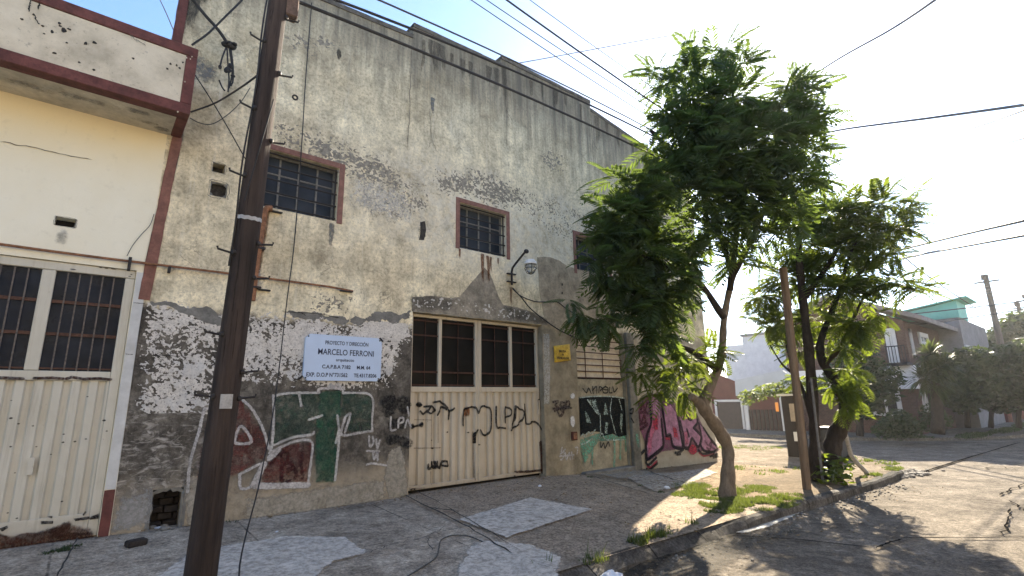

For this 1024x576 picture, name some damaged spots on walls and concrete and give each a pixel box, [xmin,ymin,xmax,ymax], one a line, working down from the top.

crack [3,141,92,160]
peeling [274,121,584,242]
rust [481,254,499,280]
peeling [135,300,222,414]
peeling [242,287,536,391]
spalling [144,476,198,531]